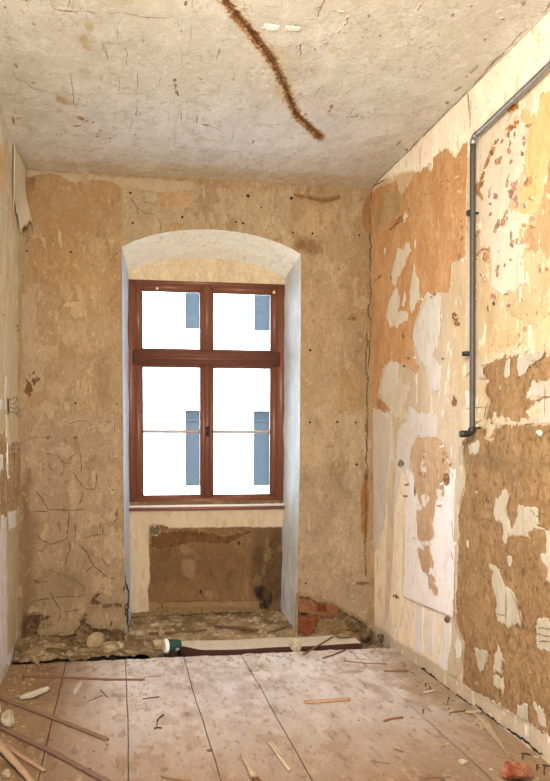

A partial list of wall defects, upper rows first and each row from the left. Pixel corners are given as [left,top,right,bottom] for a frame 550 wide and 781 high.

crack [50,0,234,138]
crack [217,0,377,143]
peeling [377,398,390,413]
peeling [0,430,21,531]
crack [30,420,130,636]
peeling [148,525,254,550]
corrosion [360,458,370,562]
peeling [398,342,550,737]
spalling [295,592,375,636]